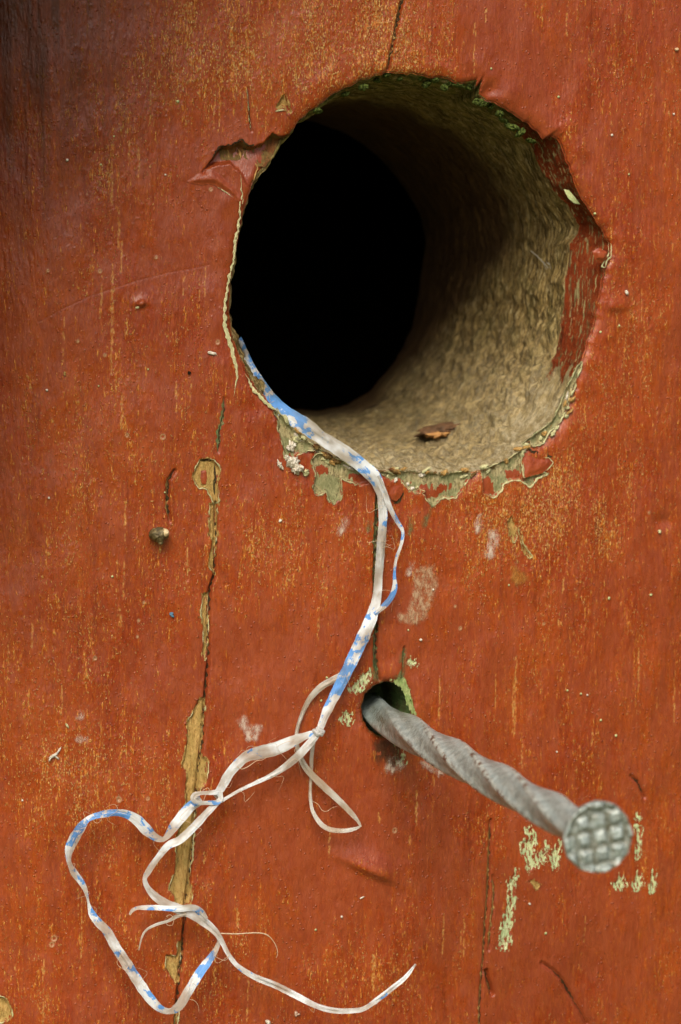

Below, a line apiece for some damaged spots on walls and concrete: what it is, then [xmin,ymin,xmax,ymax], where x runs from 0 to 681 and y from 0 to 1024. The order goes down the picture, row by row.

spalling [208,133,291,179]
peeling [380,361,583,507]
crack [165,471,174,520]
peeling [347,667,372,694]
peeling [390,655,418,715]
crack [176,522,217,1002]
peeling [496,825,562,952]
peeling [610,812,658,895]